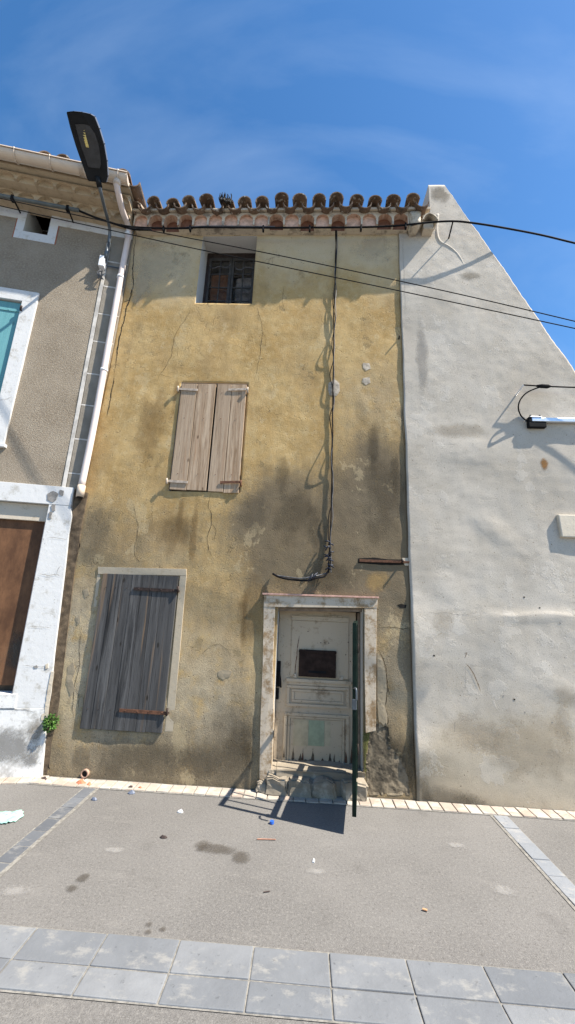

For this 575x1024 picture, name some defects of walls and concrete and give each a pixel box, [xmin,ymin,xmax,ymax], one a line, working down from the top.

crack [107,234,137,413]
spalling [366,653,410,796]